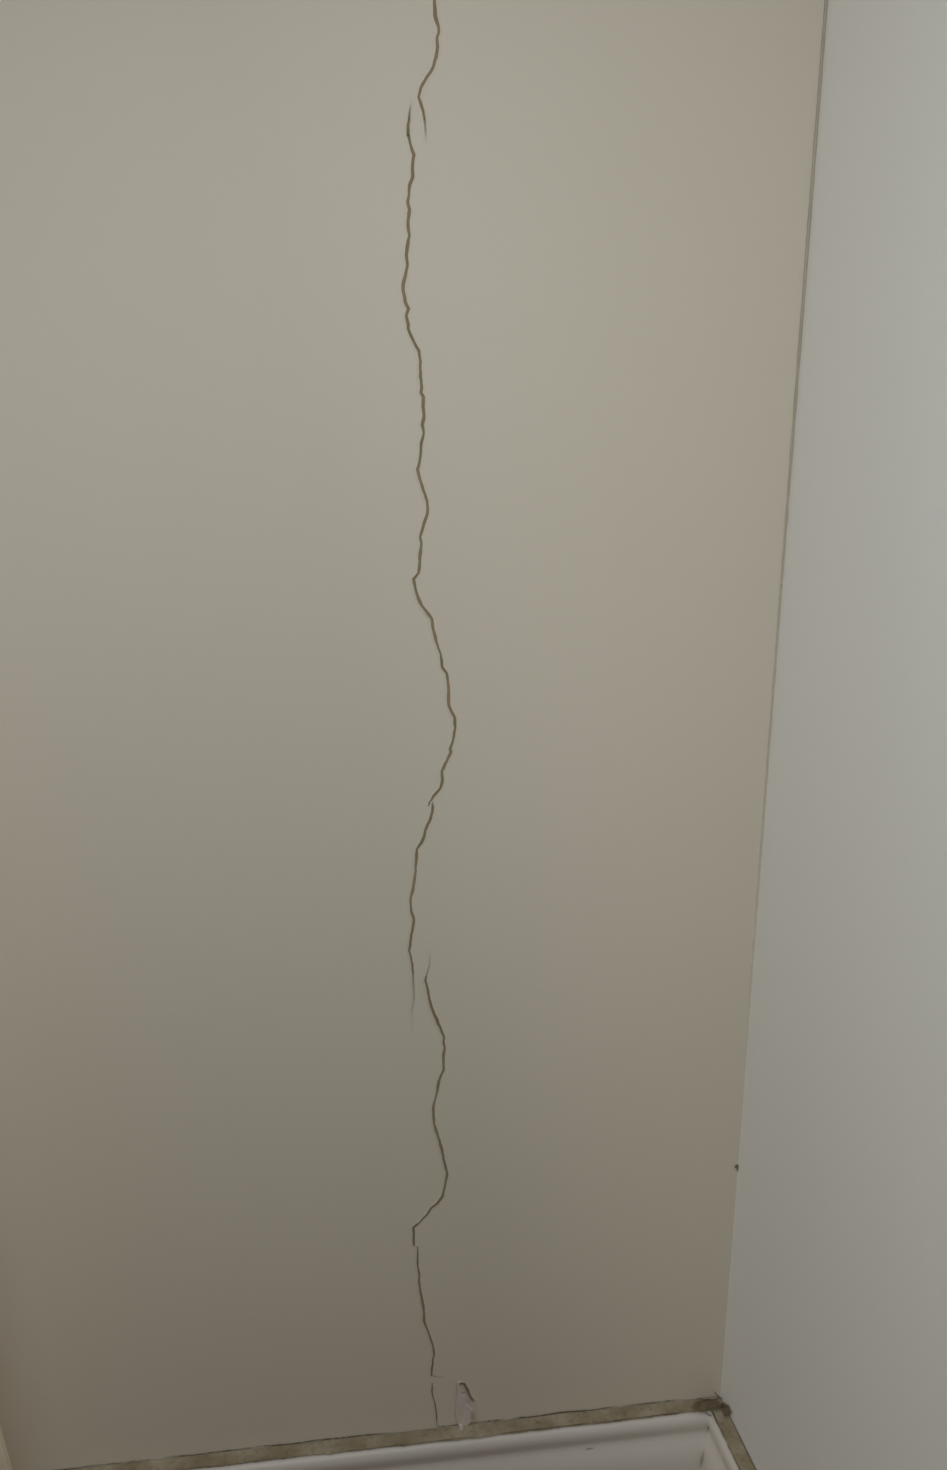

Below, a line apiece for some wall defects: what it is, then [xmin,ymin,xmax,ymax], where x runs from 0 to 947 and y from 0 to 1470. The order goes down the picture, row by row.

crack [399,0,459,1428]